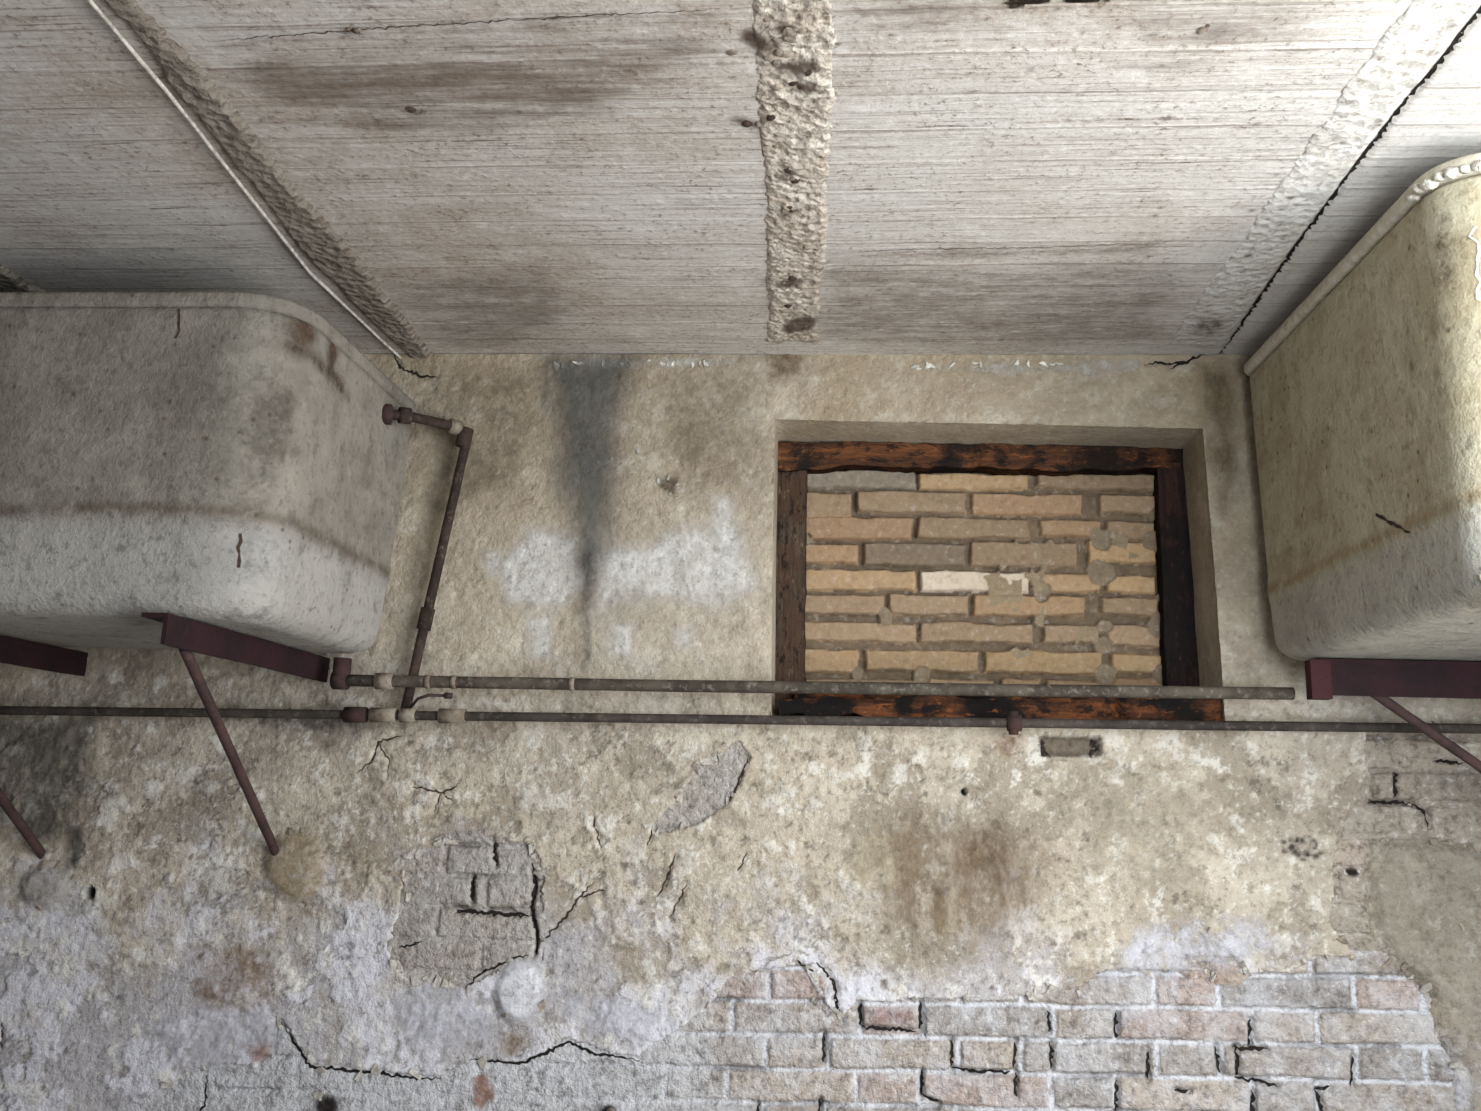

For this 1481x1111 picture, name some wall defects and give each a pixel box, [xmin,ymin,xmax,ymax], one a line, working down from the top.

crack [1144,6,1481,369]
water stain [556,364,621,590]
crack [729,757,749,802]
crack [458,863,604,987]
crack [647,829,687,919]
flaking render [113,721,1481,1111]
crack [471,1041,640,1065]